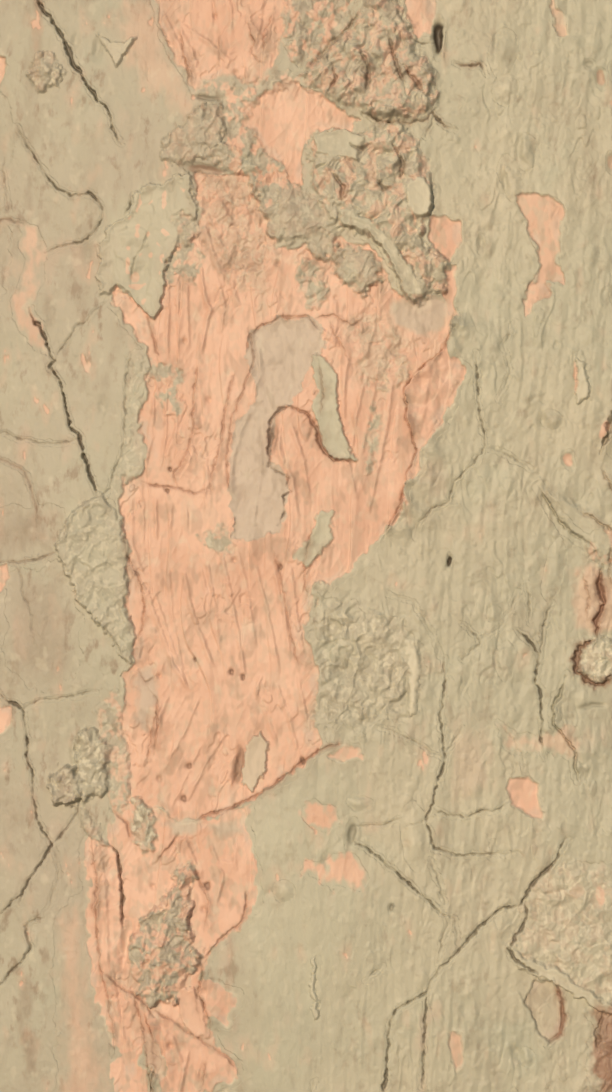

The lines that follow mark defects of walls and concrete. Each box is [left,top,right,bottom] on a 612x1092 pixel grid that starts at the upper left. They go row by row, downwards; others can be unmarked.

crack [34,0,125,147]
crack [0,123,136,257]
peeling [514,192,566,317]
crack [0,297,214,648]
peeling [78,0,473,1092]
crack [411,349,534,542]
peeling [0,700,17,742]
crack [0,658,99,989]
crack [105,840,128,933]
crack [189,740,351,826]
crack [347,579,572,1092]